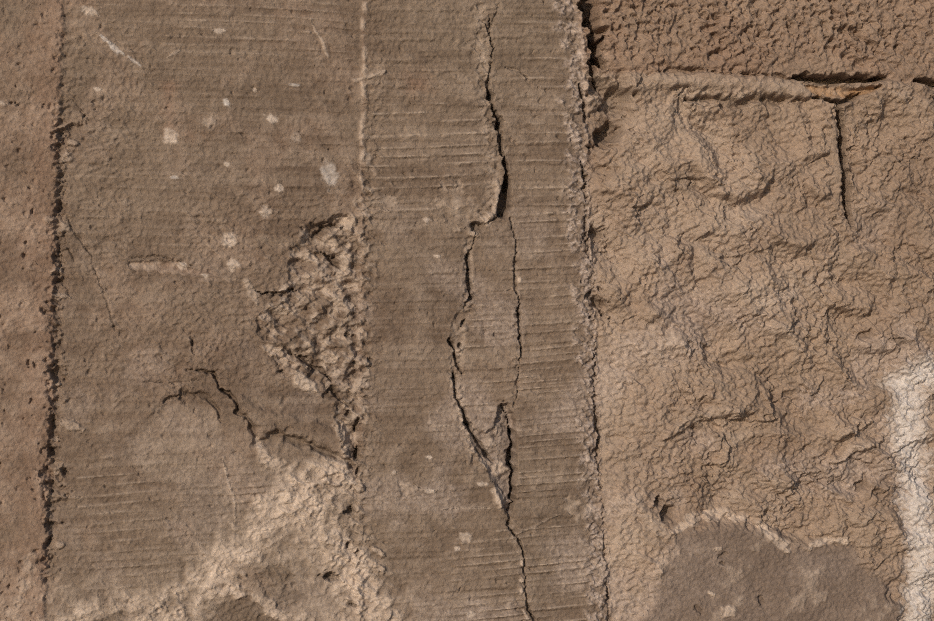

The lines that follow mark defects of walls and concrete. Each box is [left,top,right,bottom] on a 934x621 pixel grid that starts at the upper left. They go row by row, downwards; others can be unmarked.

crack [482,13,511,184]
crack [913,78,934,100]
crack [830,101,854,224]
crack [171,337,356,470]
spalling [256,215,373,493]
crack [447,337,478,453]
crack [463,238,476,309]
crack [492,217,523,408]
crack [506,513,535,621]